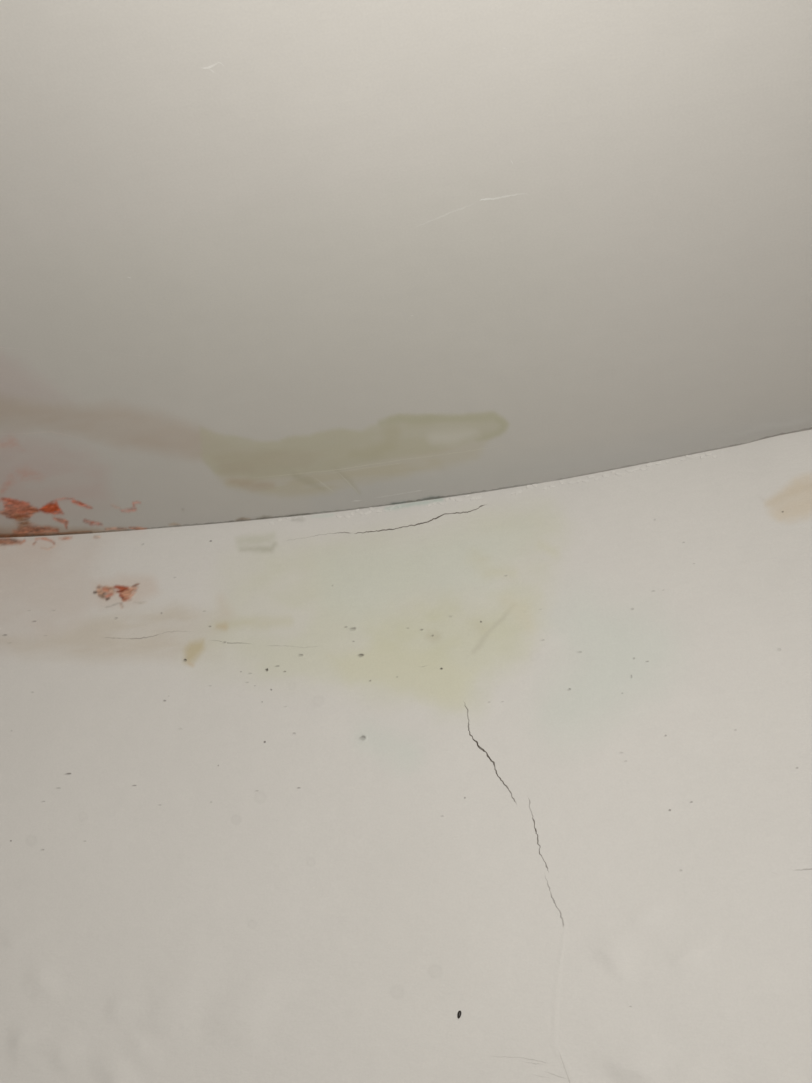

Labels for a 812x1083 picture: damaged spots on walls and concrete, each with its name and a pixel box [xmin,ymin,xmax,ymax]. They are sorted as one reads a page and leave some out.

rust [0,422,148,553]
rust [84,568,166,616]
damp [0,338,589,736]
crack [24,427,812,544]
crack [461,699,567,933]